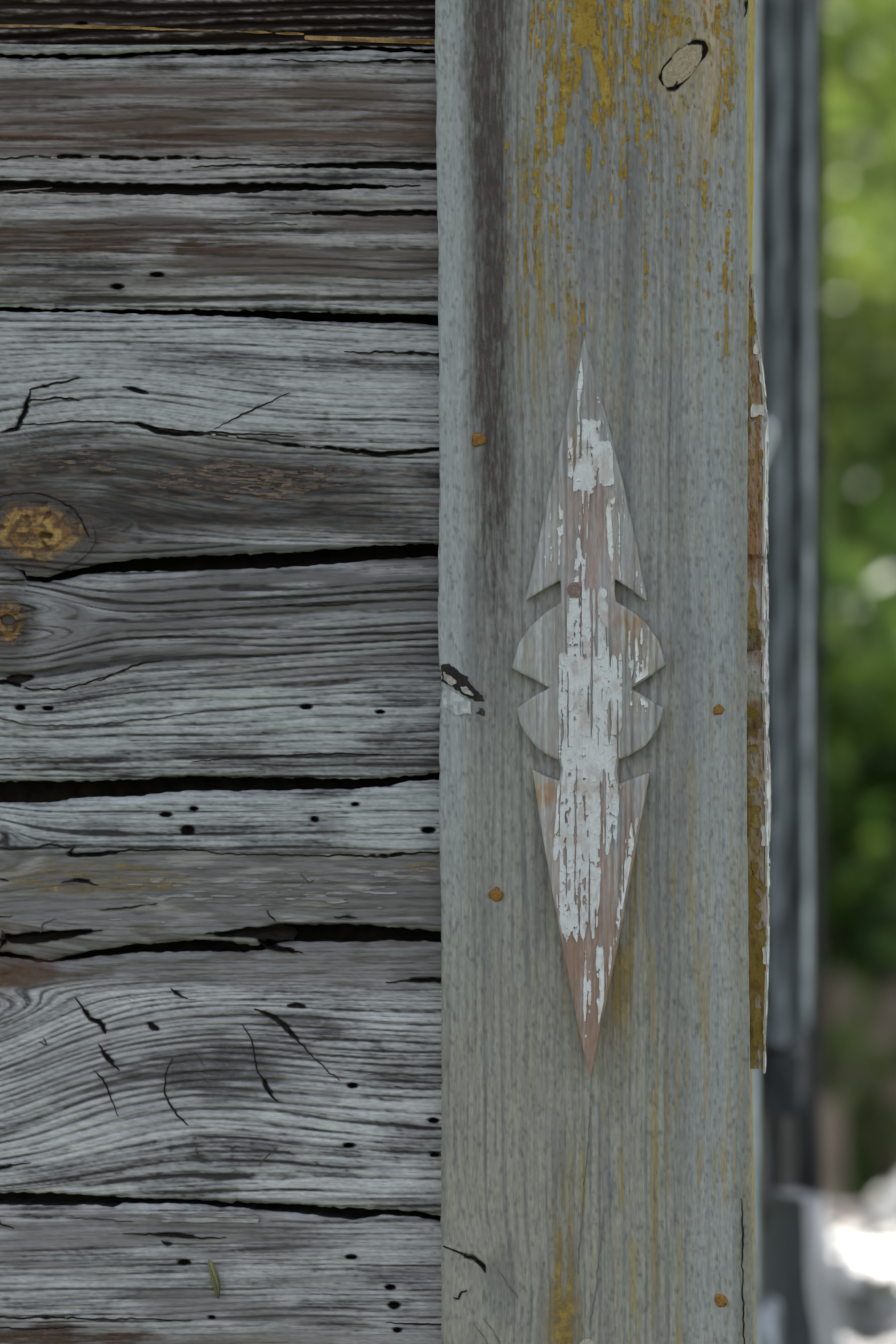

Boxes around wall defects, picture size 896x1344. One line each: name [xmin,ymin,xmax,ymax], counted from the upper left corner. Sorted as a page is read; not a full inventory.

peeling [502,0,747,374]
crack [0,377,439,456]
spalling [441,663,485,716]
peeling [544,356,649,1038]
peeling [745,273,771,1073]
crack [75,997,120,1116]
crack [147,1022,205,1164]
crack [241,1003,339,1103]